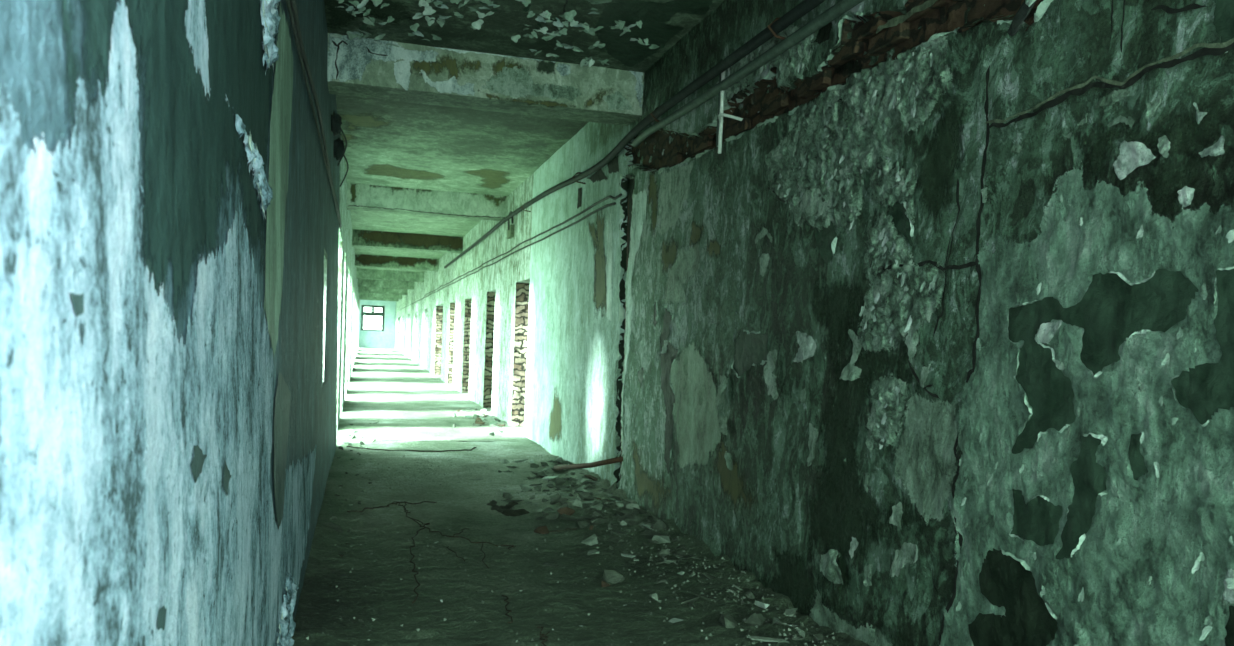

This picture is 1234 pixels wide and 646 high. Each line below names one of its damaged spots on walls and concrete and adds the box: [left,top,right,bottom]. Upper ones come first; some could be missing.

spalling [327,0,713,108]
spalling [1213,0,1234,53]
spalling [577,0,1053,388]
crack [883,0,1234,398]
peeling [0,0,316,646]
peeling [653,243,733,476]
peeling [763,349,779,400]
peeling [807,423,819,467]
peeling [819,537,859,585]
peeling [809,590,893,646]
crack [932,428,963,645]
peeling [889,89,1234,646]